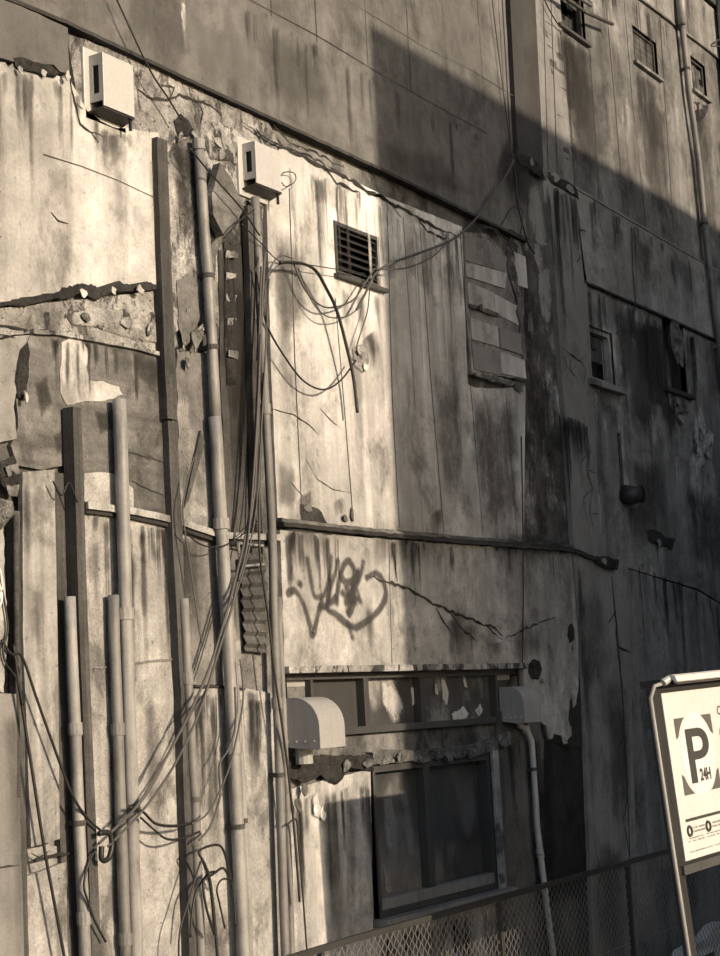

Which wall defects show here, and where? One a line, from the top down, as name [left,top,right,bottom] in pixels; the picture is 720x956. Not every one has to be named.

damp [18,75,33,132]
spalling [174,114,243,164]
damp [638,79,666,194]
damp [636,4,707,142]
damp [547,188,579,314]
spalling [0,281,157,343]
damp [532,378,590,494]
crack [371,552,555,642]
peeling [382,682,414,720]
peeling [435,679,483,720]
peeling [540,673,582,750]
spalling [288,731,514,821]